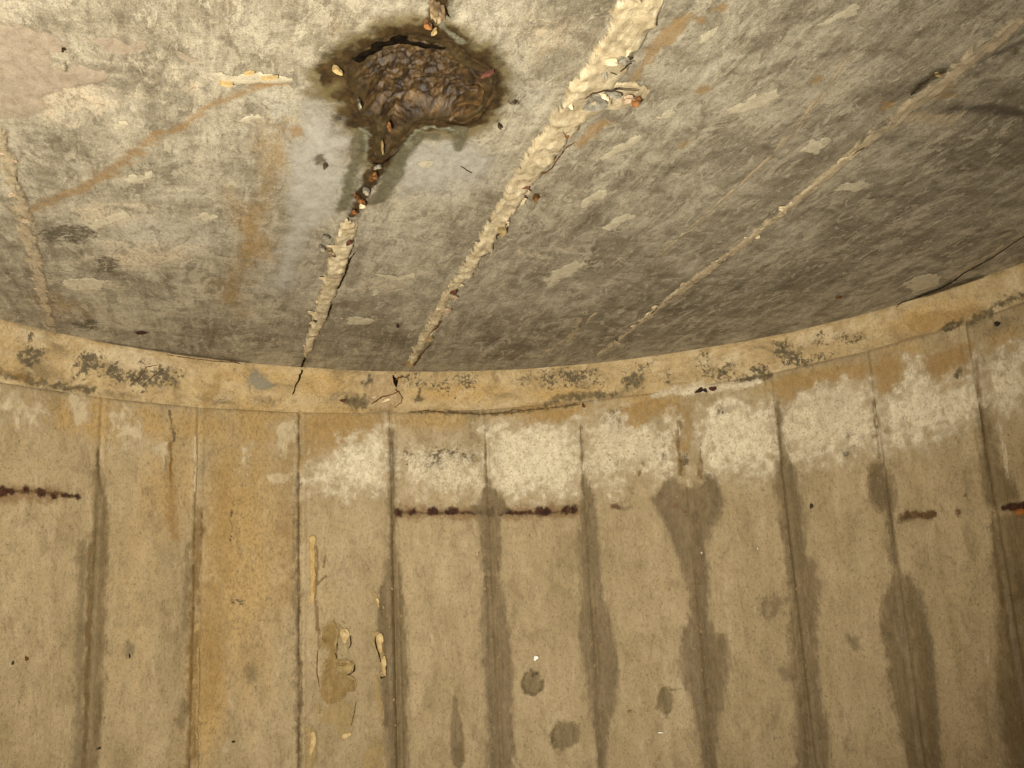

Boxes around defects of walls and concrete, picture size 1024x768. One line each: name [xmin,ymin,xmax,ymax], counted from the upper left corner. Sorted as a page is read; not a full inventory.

crack [481,143,574,257]
crack [327,253,354,318]
crack [896,236,1024,307]
leakage [17,332,44,371]
leakage [72,351,184,393]
crack [292,357,306,395]
rust [0,486,80,500]
rust [394,505,578,517]
rust [900,511,936,521]
leakage [266,330,1024,768]
peeling [305,621,357,768]
peeling [372,631,387,722]